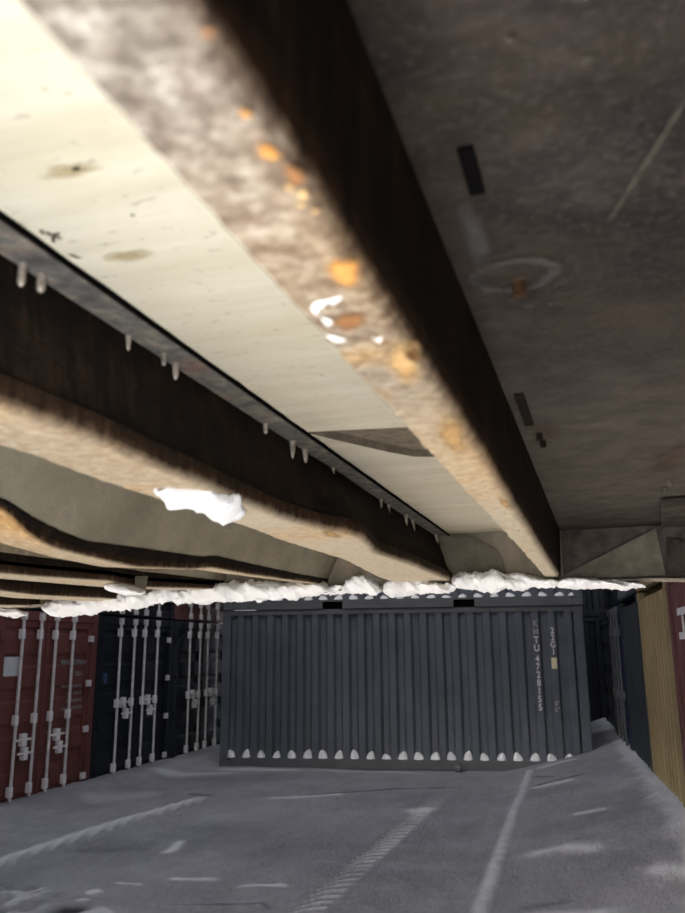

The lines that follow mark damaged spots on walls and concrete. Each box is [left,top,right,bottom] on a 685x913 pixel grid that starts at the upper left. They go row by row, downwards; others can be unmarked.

corrosion [259,145,279,160]
corrosion [285,166,319,213]
corrosion [329,261,357,286]
corrosion [333,314,363,331]
corrosion [390,347,420,381]